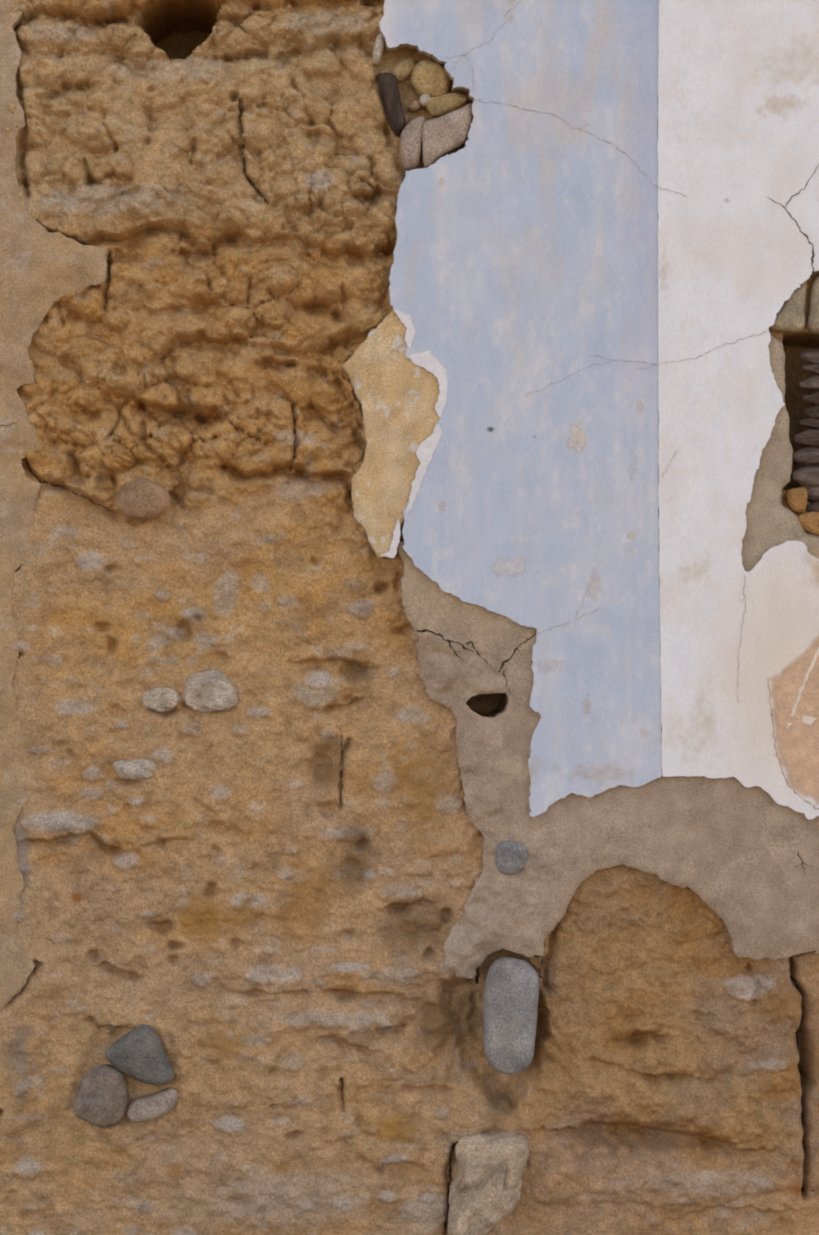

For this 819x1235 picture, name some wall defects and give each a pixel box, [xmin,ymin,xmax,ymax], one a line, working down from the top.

crack [450,0,687,196]
crack [768,166,818,273]
crack [527,331,766,395]
spalling [782,329,819,491]
spalling [2,0,483,992]
flaking render [773,639,819,801]
crack [789,952,811,1074]